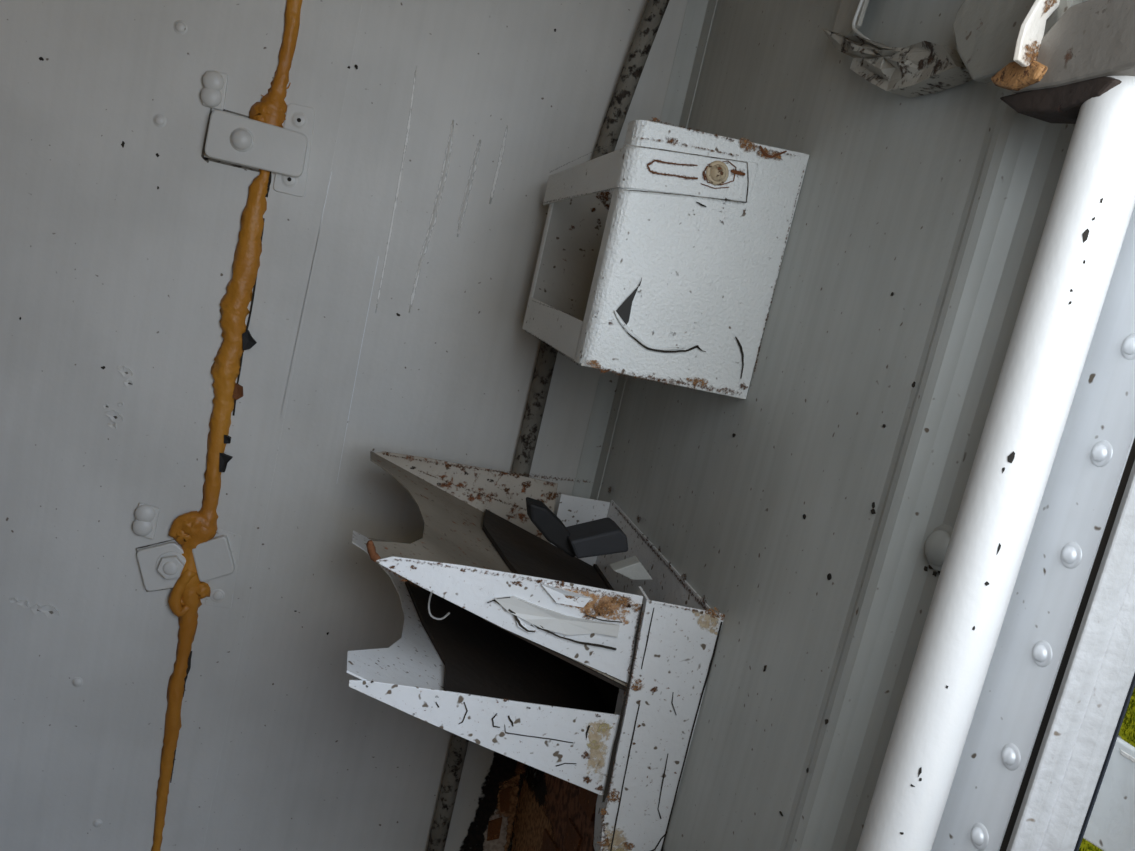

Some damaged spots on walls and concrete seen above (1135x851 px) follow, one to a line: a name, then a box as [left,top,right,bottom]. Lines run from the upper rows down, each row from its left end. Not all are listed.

crack [261,172,272,244]
crack [232,277,257,416]
crack [183,651,192,697]
peeling [483,809,509,851]